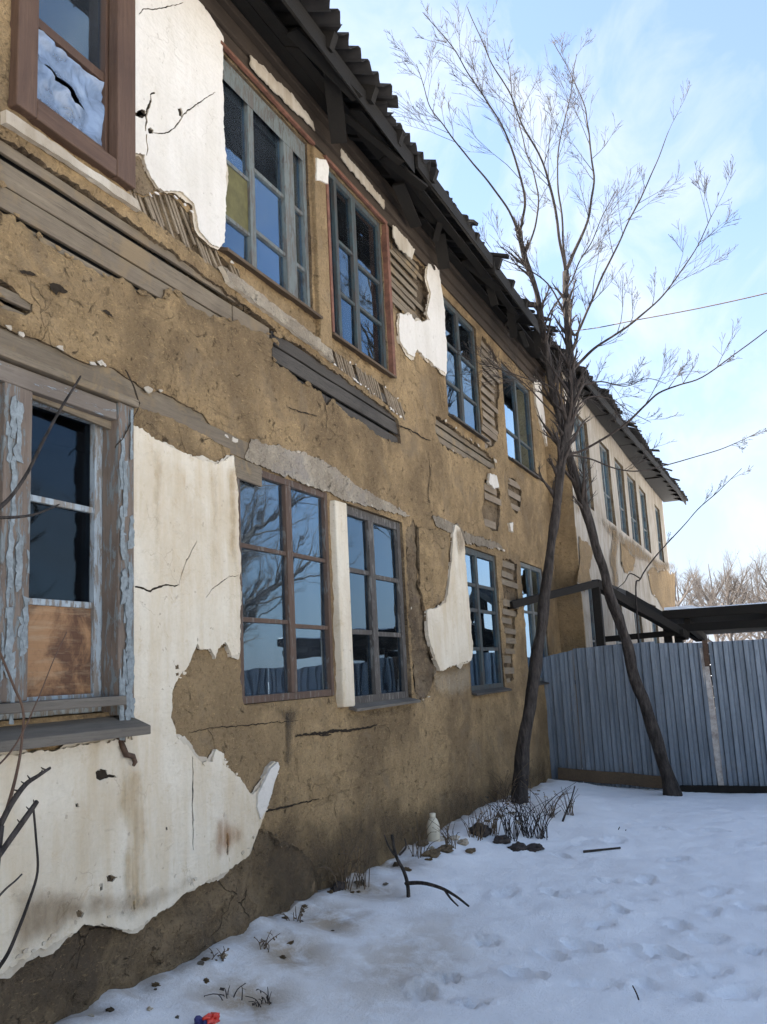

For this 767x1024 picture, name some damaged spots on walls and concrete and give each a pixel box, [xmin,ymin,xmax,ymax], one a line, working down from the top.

crack [135,92,212,134]
peeling [0,140,405,443]
flaking render [435,340,521,531]
peeling [0,395,30,724]
crack [135,584,178,592]
peeling [119,407,238,721]
spalling [0,649,318,1024]
crack [191,720,377,741]
crack [266,799,318,812]